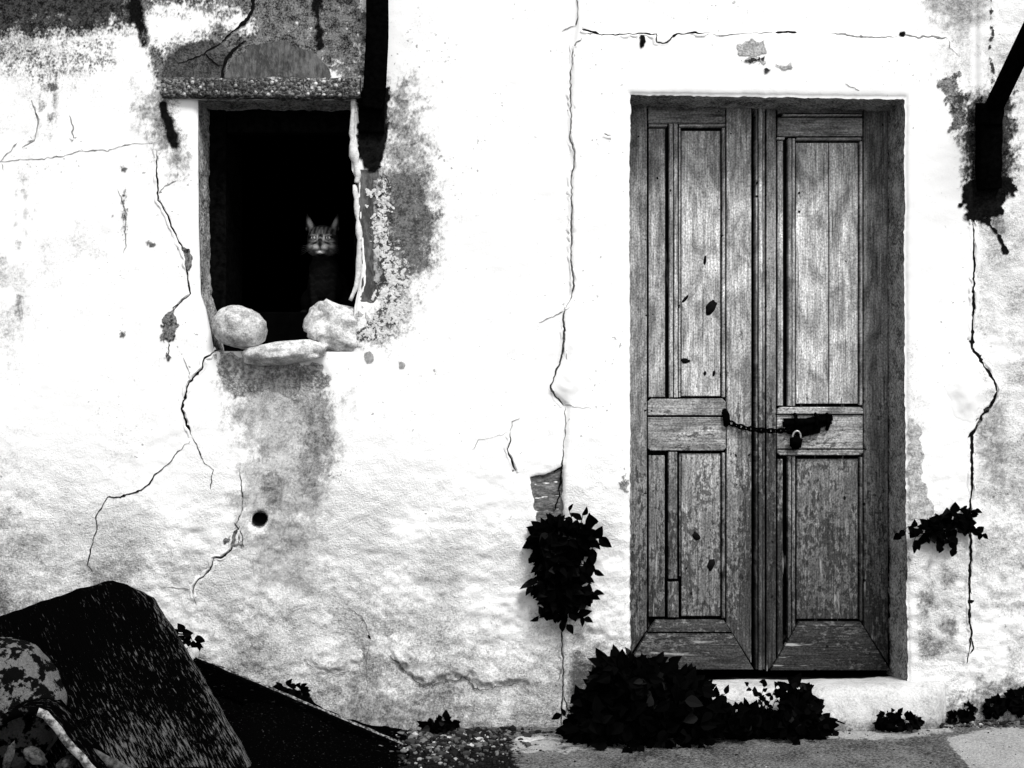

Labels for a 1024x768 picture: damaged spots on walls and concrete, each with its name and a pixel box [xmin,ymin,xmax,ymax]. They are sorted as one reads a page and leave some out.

leakage [0,0,366,177]
crack [178,0,255,78]
peeling [737,38,793,73]
crack [830,33,958,55]
crack [0,99,192,315]
leakage [373,75,444,349]
crack [539,0,797,469]
crack [87,344,218,574]
crack [164,471,244,606]
leakage [221,389,344,593]
spalling [530,465,564,522]
crack [963,220,1001,663]